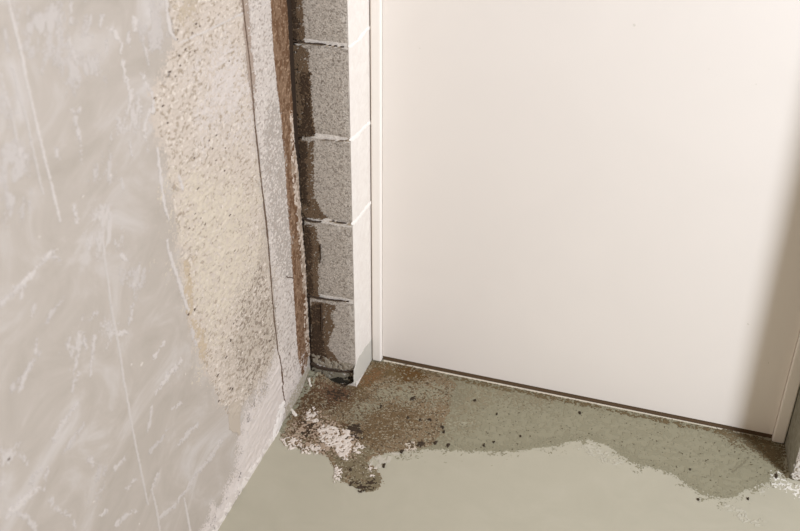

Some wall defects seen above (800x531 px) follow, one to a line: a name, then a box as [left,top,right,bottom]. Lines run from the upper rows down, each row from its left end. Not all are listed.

water stain [51,7,294,446]
crack [242,0,354,402]
water stain [212,0,800,531]